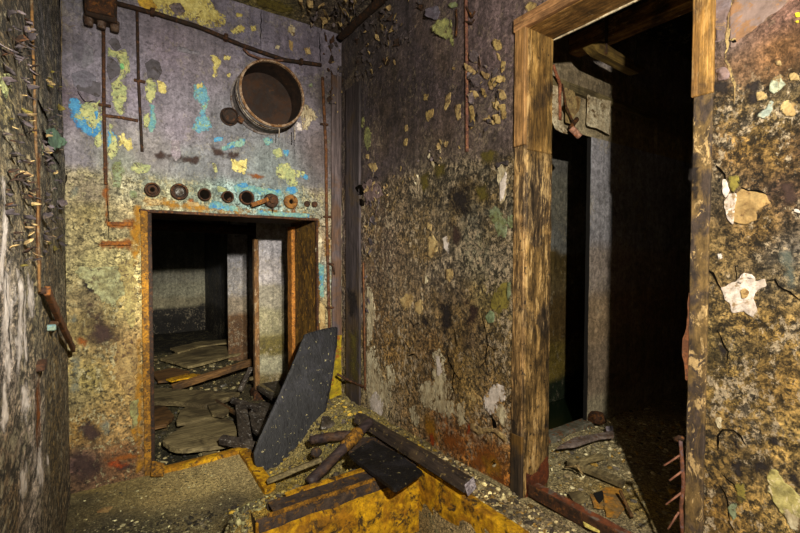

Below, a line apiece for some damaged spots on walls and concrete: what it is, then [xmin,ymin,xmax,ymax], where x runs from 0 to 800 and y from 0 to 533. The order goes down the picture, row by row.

peeling [2,38,151,267]
rust [161,199,248,214]
peeling [187,137,308,212]
flaking render [722,175,771,224]
leakage [0,182,34,429]
crack [709,266,737,289]
flaking render [721,273,766,317]
crack [767,279,800,300]
flaking render [409,349,507,442]
leakage [37,447,49,490]
rust [425,417,506,486]
flaking render [767,469,800,532]